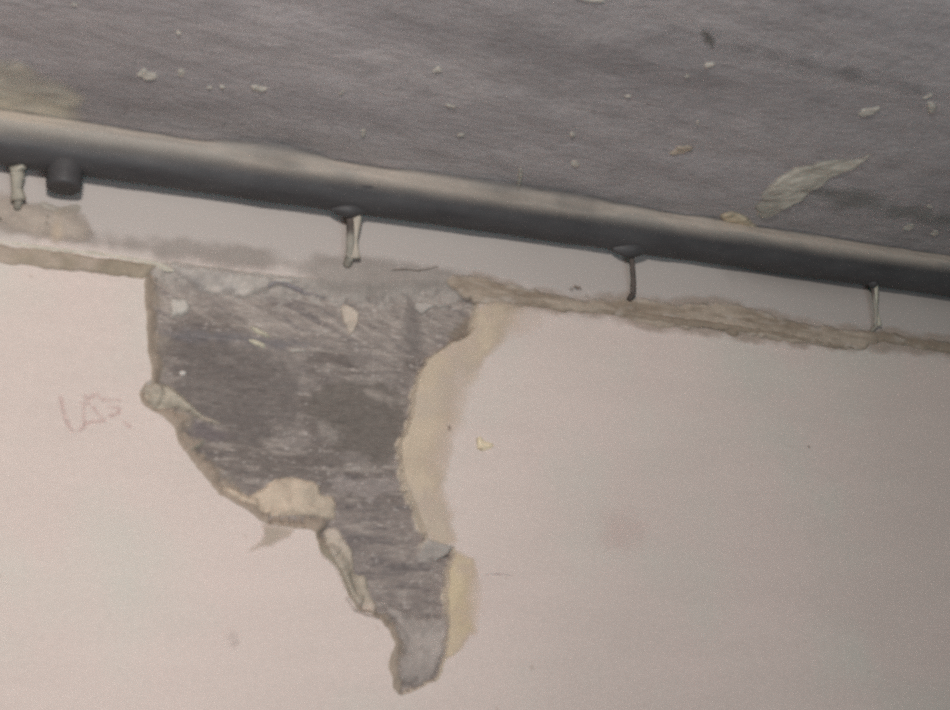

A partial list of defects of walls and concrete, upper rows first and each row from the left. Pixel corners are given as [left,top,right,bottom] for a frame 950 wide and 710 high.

spalling [0,241,950,696]